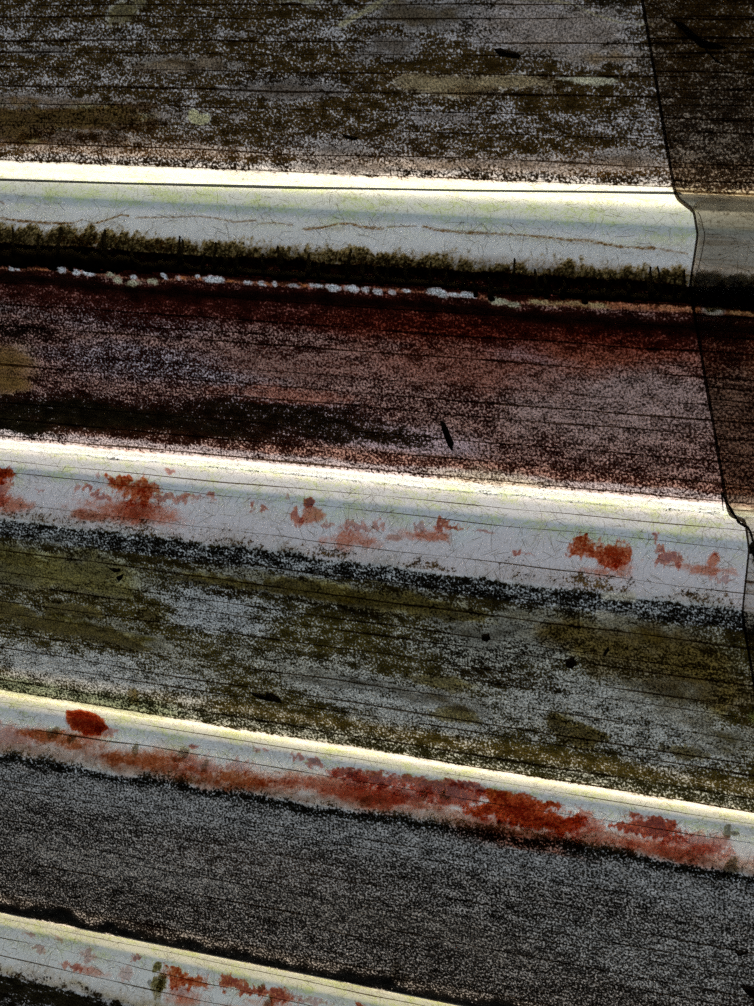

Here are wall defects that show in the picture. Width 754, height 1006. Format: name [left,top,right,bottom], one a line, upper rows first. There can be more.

damp [30,131,141,146]
corrosion [0,465,33,512]
corrosion [73,473,215,525]
corrosion [291,497,329,528]
corrosion [336,518,382,547]
corrosion [388,515,463,541]
corrosion [565,533,632,576]
corrosion [652,533,731,575]
corrosion [16,709,739,880]
corrosion [162,963,300,1006]